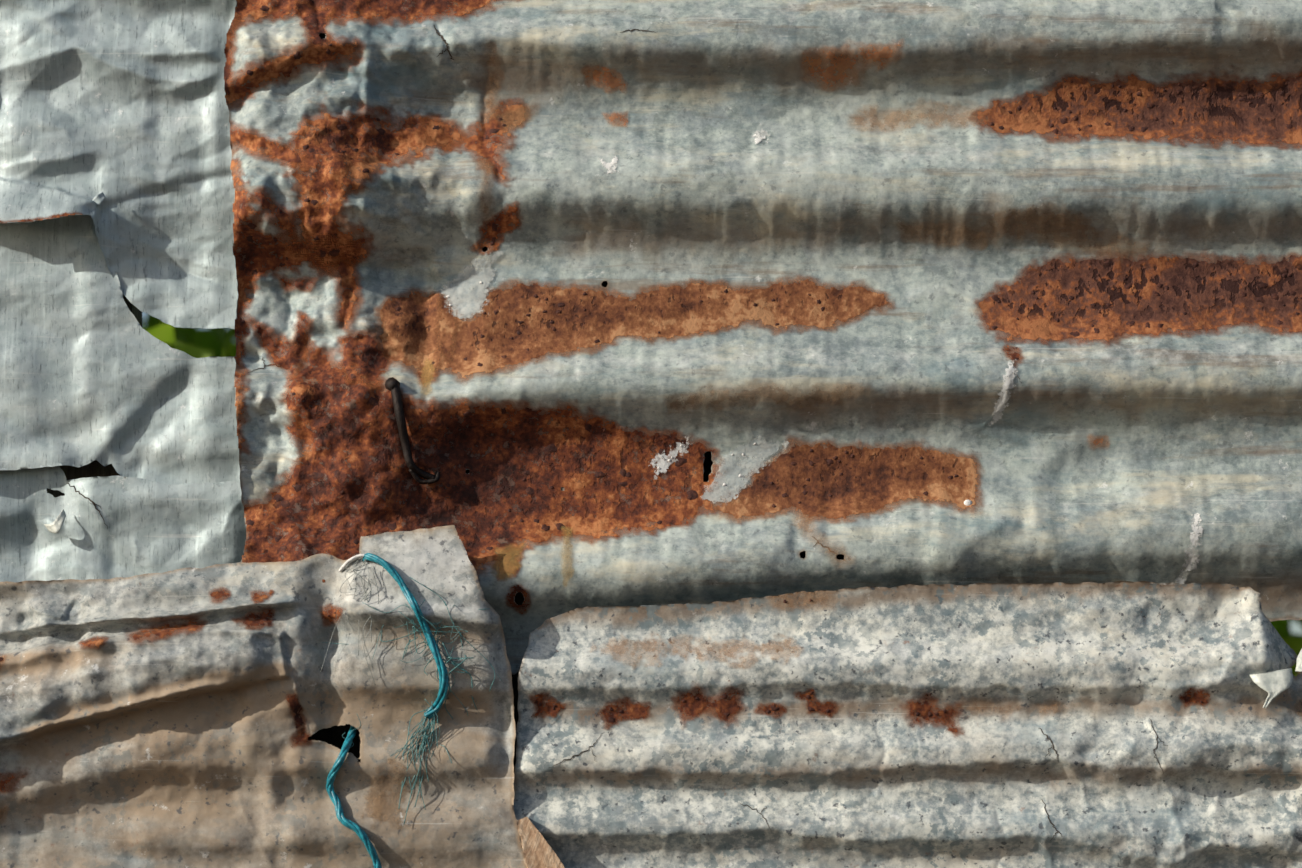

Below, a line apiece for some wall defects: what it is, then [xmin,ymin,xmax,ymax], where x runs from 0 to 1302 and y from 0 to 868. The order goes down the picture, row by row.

rust [224,0,499,107]
rust [973,71,1302,149]
rust [975,253,1302,362]
rust [230,100,980,614]
rust [210,588,230,602]
rust [233,590,274,629]
rust [80,637,107,648]
rust [130,619,205,643]
rust [529,693,565,718]
rust [600,697,650,729]
rust [666,680,837,722]
rust [906,694,963,735]